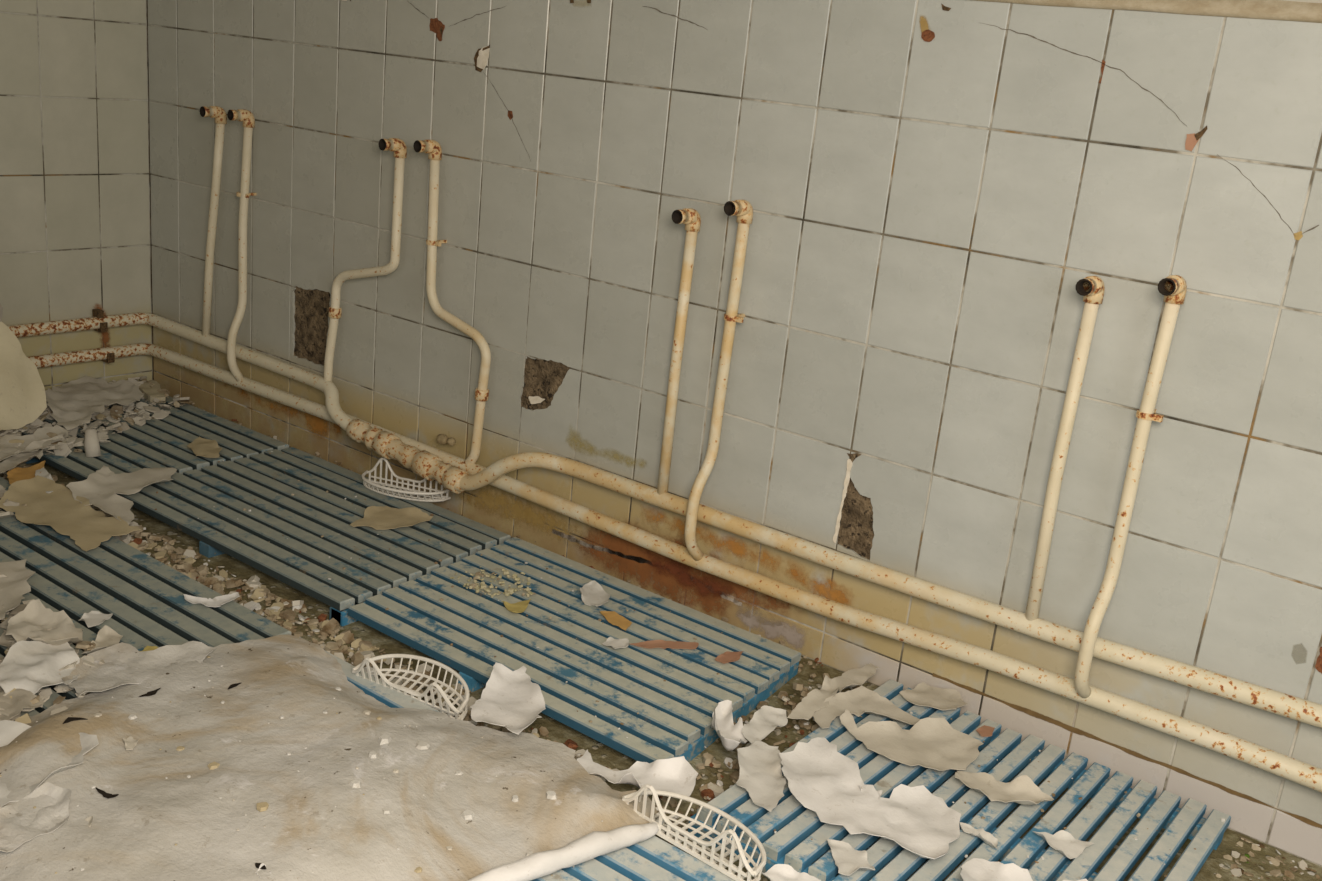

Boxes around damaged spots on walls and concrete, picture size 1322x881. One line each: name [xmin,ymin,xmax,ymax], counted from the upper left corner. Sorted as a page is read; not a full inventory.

spalling [294,286,331,365]
spalling [521,357,570,410]
spalling [833,453,874,560]